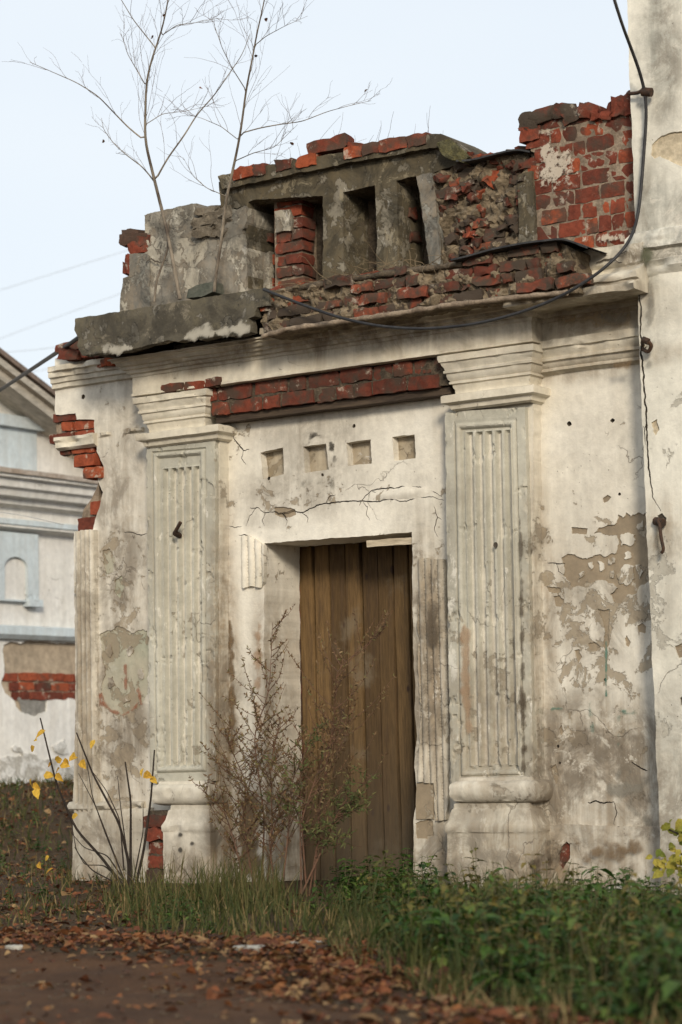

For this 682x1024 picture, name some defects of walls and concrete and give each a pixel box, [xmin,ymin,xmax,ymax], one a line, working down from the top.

peeling [652,132,682,166]
spalling [119,228,151,276]
crack [230,486,442,536]
peeling [547,513,666,662]
spalling [1,641,76,716]
peeling [100,626,150,716]
peeling [0,739,74,786]
crack [589,800,617,821]